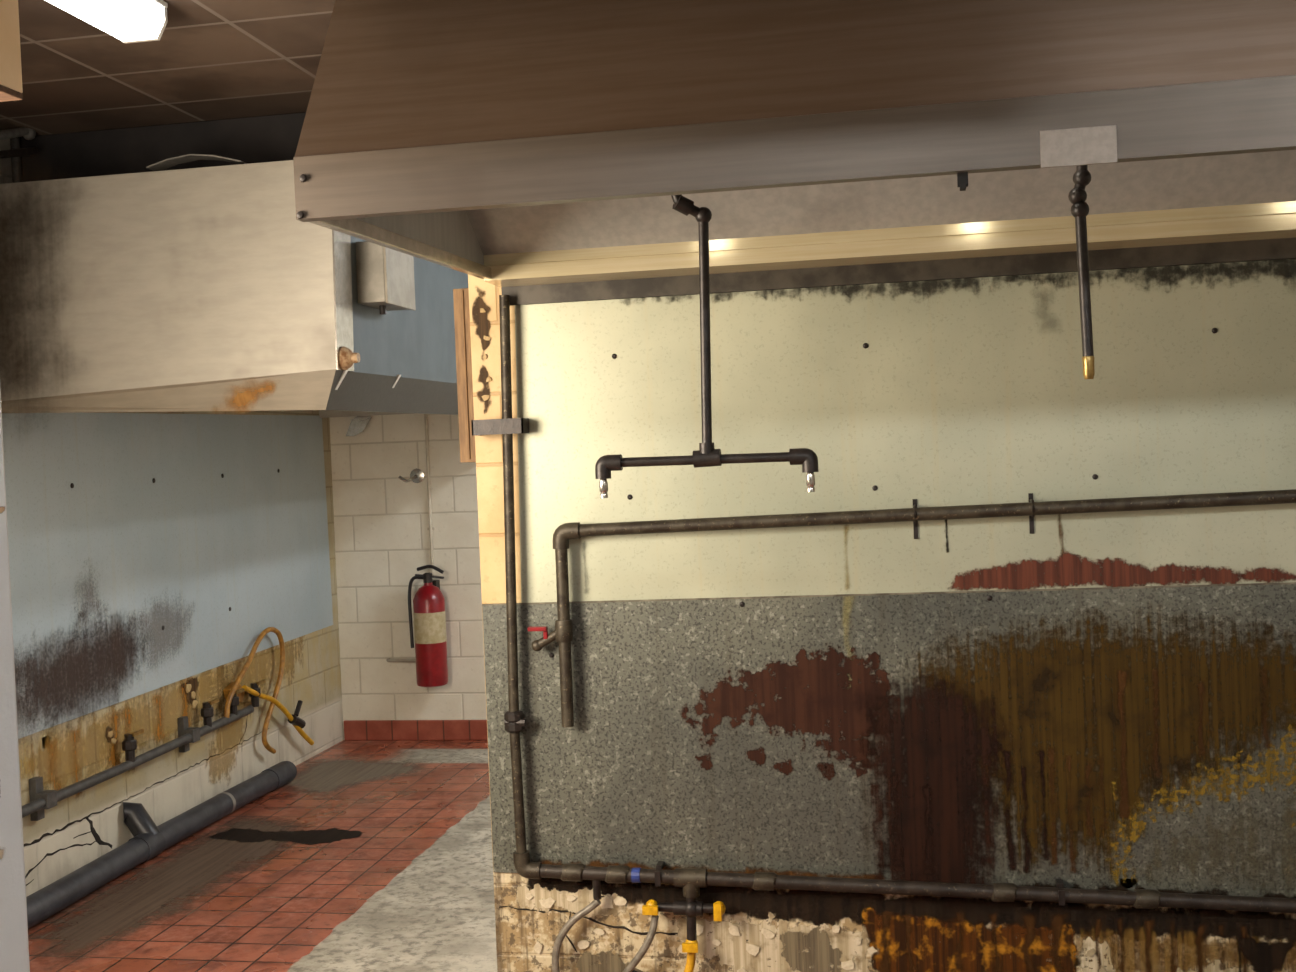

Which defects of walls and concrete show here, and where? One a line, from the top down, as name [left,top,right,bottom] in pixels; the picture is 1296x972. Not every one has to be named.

crack [24,715,269,886]
rust [540,643,1296,972]
peeling [517,883,644,972]
peeling [675,912,878,972]